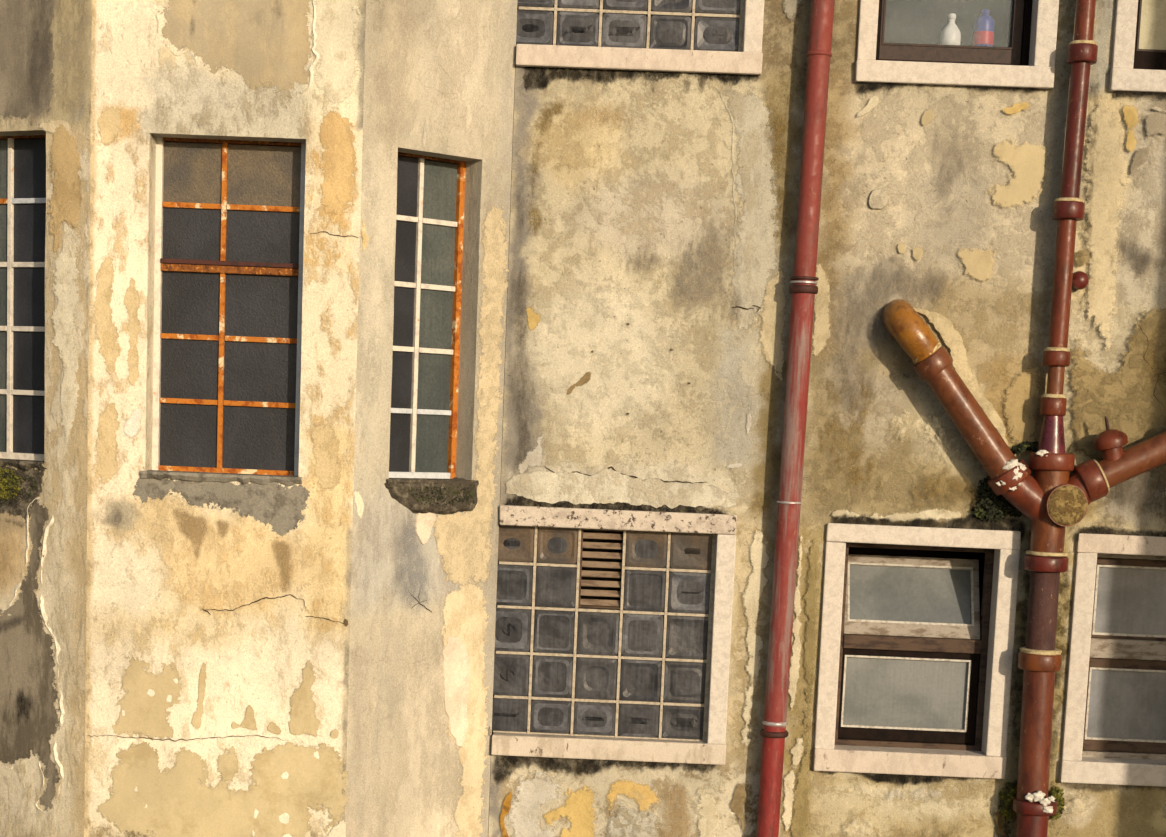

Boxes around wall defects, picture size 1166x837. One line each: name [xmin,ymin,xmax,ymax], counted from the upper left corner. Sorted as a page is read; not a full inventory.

peeling [0,0,55,120]
peeling [155,0,320,99]
peeling [989,138,1050,208]
leakage [822,269,946,486]
leakage [833,515,1025,540]
leakage [1076,526,1166,541]
flaking render [0,497,65,813]
crack [203,594,344,624]
peeling [96,655,350,837]
peeling [543,780,662,837]